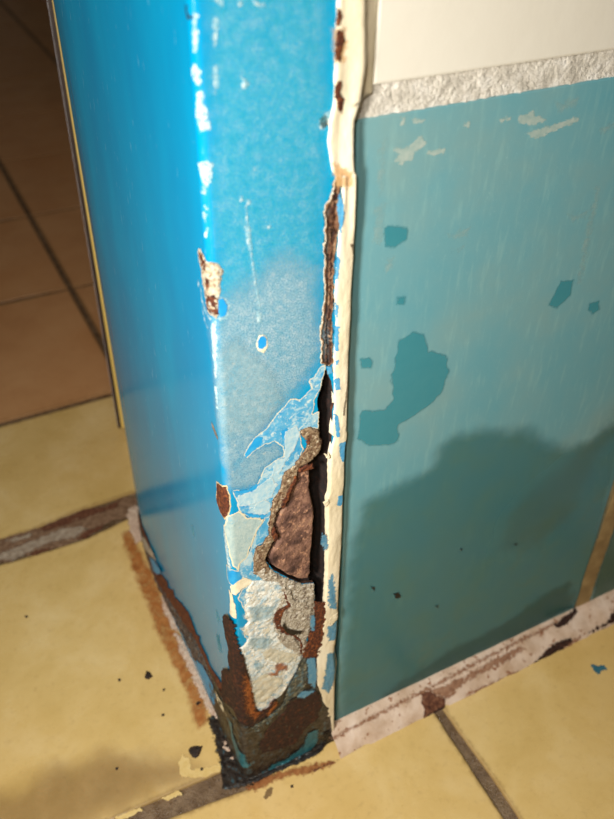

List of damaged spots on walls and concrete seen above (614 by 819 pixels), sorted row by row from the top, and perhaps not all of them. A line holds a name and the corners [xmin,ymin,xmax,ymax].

peeling [185,5,199,52]
peeling [191,64,210,131]
peeling [198,161,213,194]
rust [198,248,230,328]
leakage [358,332,449,445]
peeling [211,321,332,639]
rust [281,463,314,509]
leakage [333,429,614,739]
rust [124,509,335,790]